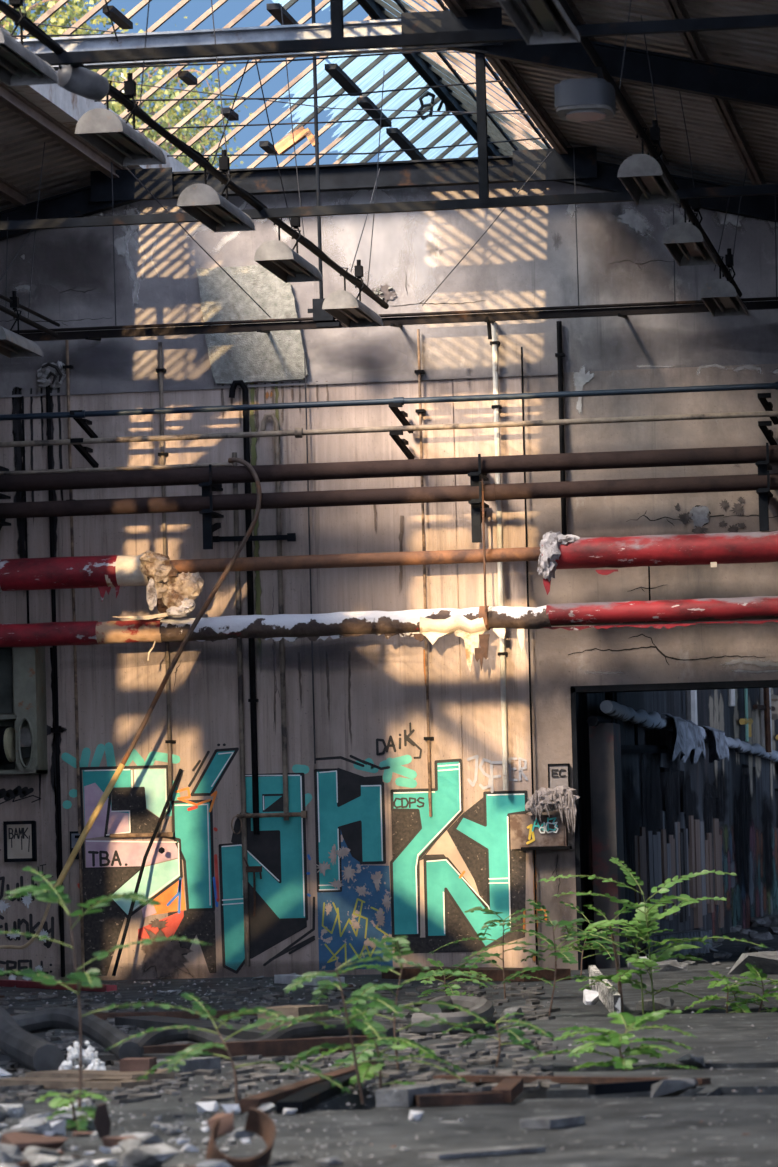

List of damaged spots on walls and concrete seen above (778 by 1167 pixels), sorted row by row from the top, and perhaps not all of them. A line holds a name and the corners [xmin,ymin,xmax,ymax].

peeling [675,497,747,534]
crack [568,634,765,665]